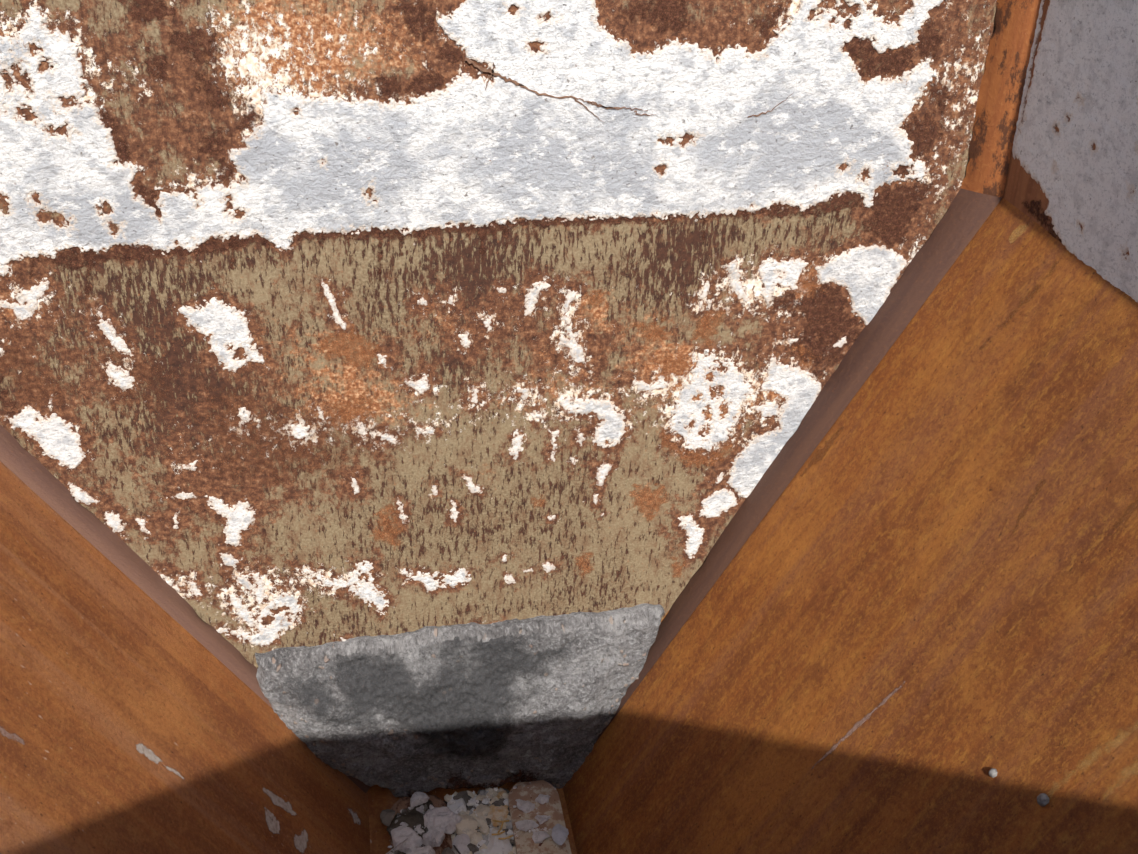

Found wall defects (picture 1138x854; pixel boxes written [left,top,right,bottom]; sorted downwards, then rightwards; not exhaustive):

rust [29,234,270,296]
peeling [178,297,265,373]
peeling [0,0,947,277]
rust [291,80,951,281]
rust [633,317,689,380]
rust [769,264,864,378]
peeling [726,244,919,325]
rust [1022,200,1062,243]
peeling [4,398,150,536]
peeling [633,349,822,559]
peeling [166,492,305,646]
leakage [295,635,563,759]